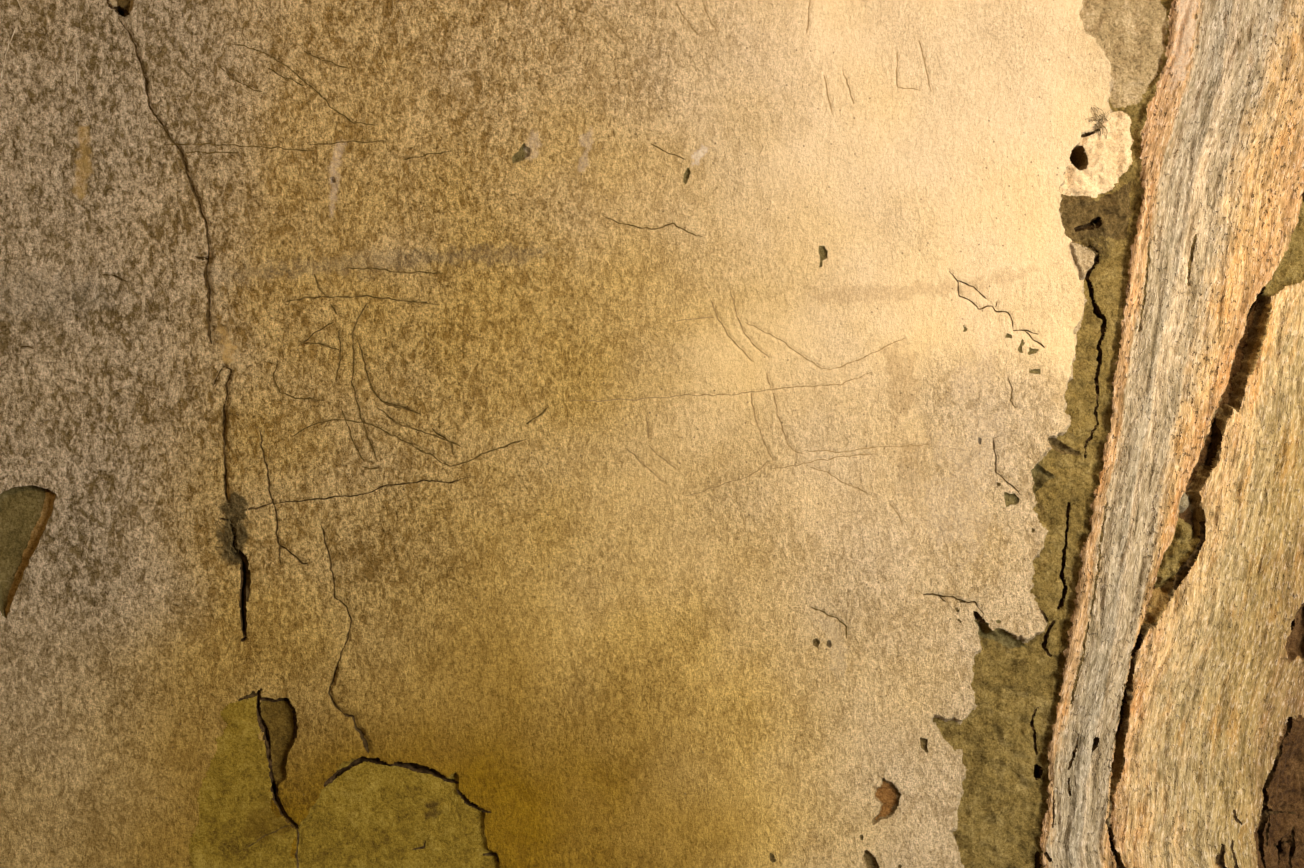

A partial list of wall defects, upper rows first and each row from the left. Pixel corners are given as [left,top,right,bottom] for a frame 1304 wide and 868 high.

flaking render [1256,199,1304,299]
crack [949,271,1045,348]
crack [106,0,470,753]
flaking render [920,0,1173,868]
flaking render [0,485,56,618]
crack [248,825,300,868]
flaking render [189,688,501,868]
flaking render [860,778,901,868]
spalling [1216,839,1239,868]